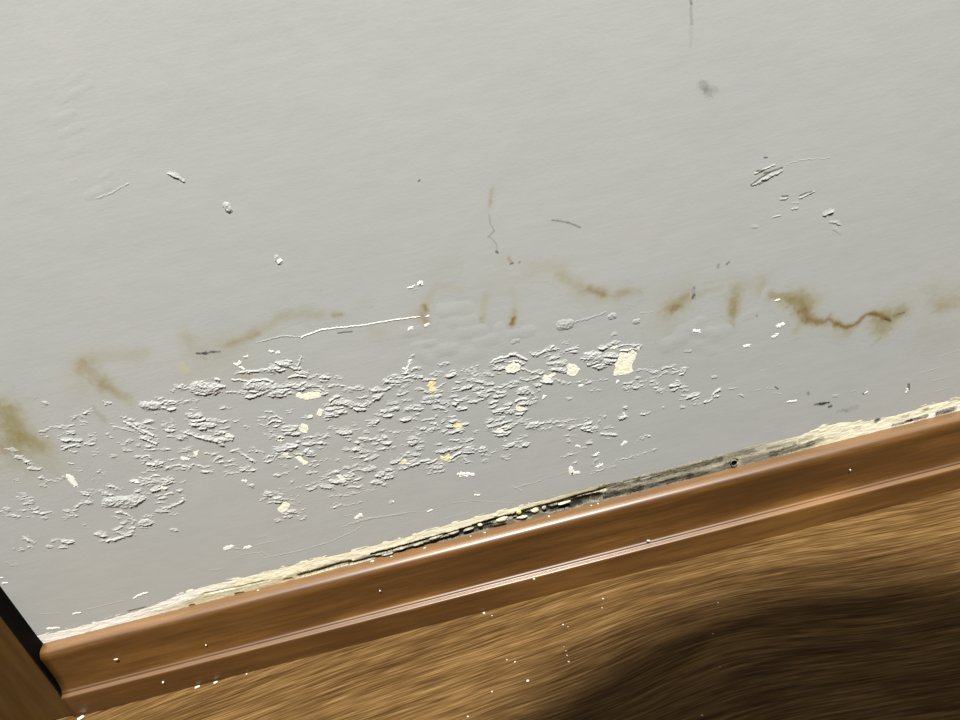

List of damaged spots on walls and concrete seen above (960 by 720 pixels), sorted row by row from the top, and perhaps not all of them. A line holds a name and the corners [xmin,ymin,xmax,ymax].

spalling [750,156,830,186]
spalling [772,191,815,218]
peeling [822,208,842,235]
water stain [55,292,378,426]
water stain [401,247,960,361]
water stain [0,379,96,499]
peeling [0,332,737,552]
flaking render [679,397,960,469]
flaking render [37,482,645,643]